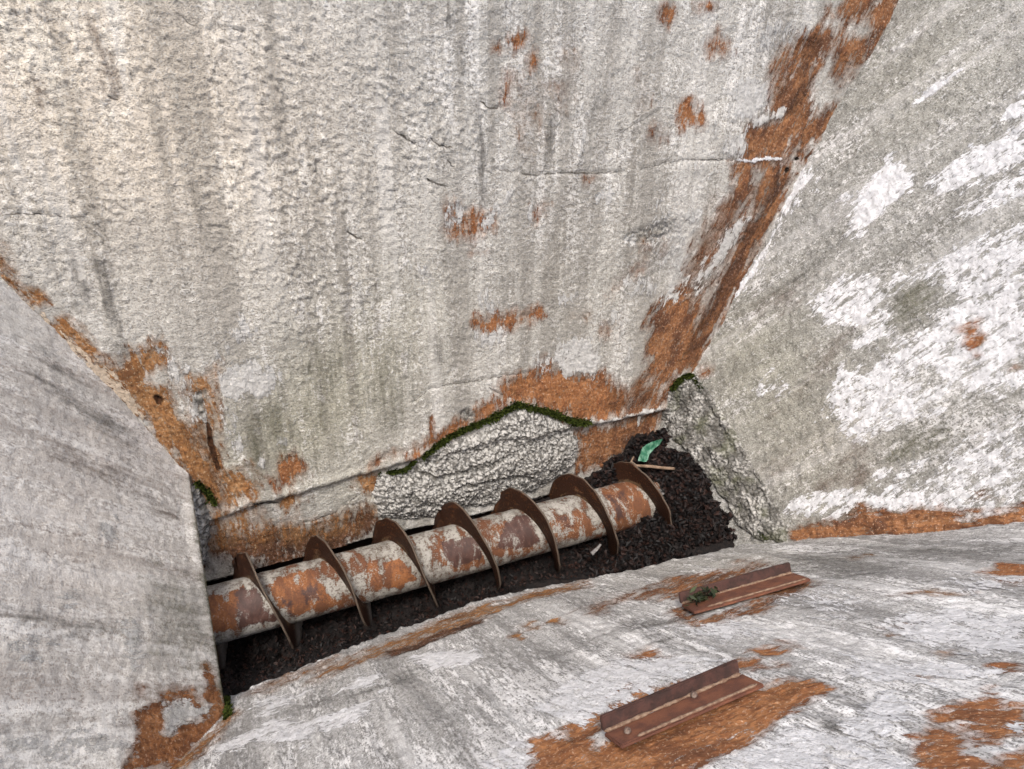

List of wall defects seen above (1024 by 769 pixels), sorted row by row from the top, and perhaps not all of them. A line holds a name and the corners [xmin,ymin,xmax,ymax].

crack [501,169,617,177]
rust [393,0,898,475]
rust [0,256,381,570]
rust [790,490,1024,541]
rust [123,660,239,769]
rust [251,579,590,695]
rust [510,559,815,640]
rust [526,640,835,769]
rust [903,685,1024,769]
rust [984,662,1023,674]